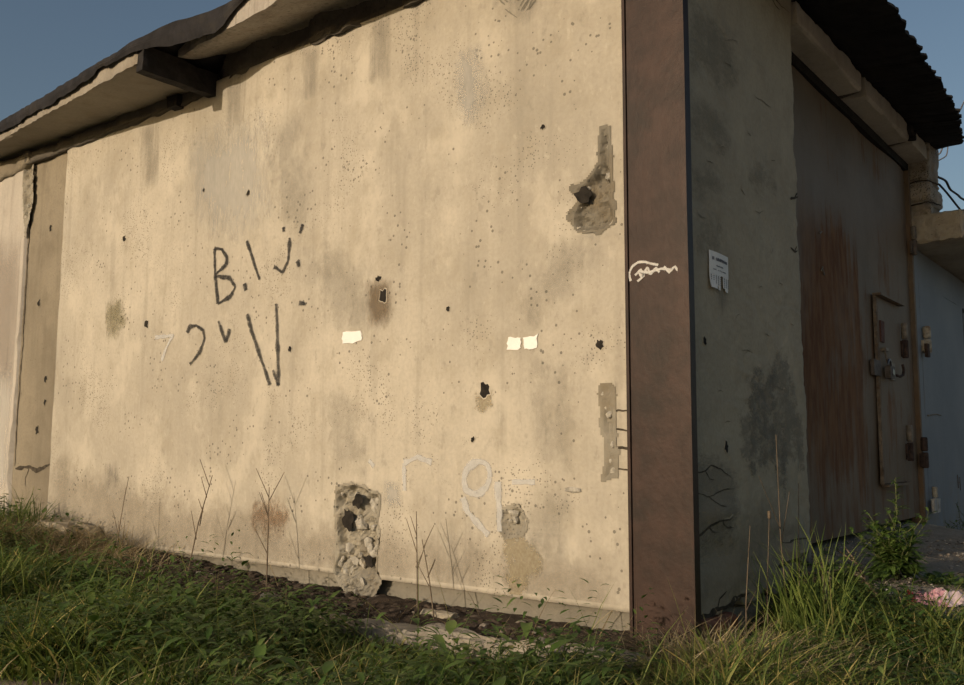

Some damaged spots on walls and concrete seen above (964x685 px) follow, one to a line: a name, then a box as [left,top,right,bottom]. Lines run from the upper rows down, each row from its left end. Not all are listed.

spalling [566,124,617,235]
rust [370,285,388,320]
spalling [333,482,382,598]